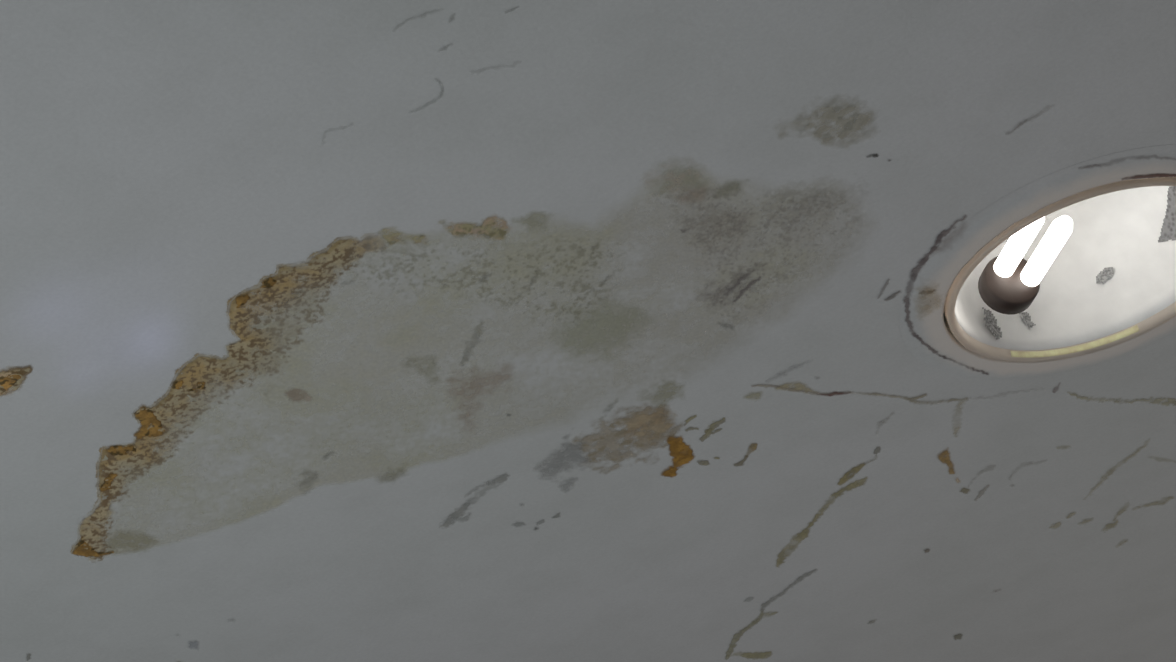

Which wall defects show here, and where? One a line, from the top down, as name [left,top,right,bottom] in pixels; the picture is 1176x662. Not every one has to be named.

crack [1084,165,1176,180]
water stain [449,179,833,338]
crack [878,216,988,375]
water stain [0,366,32,396]
water stain [72,238,470,561]
water stain [542,384,680,489]
corrosion [662,437,694,477]
crack [747,383,967,403]
crack [1068,392,1176,406]
water stain [777,463,867,567]